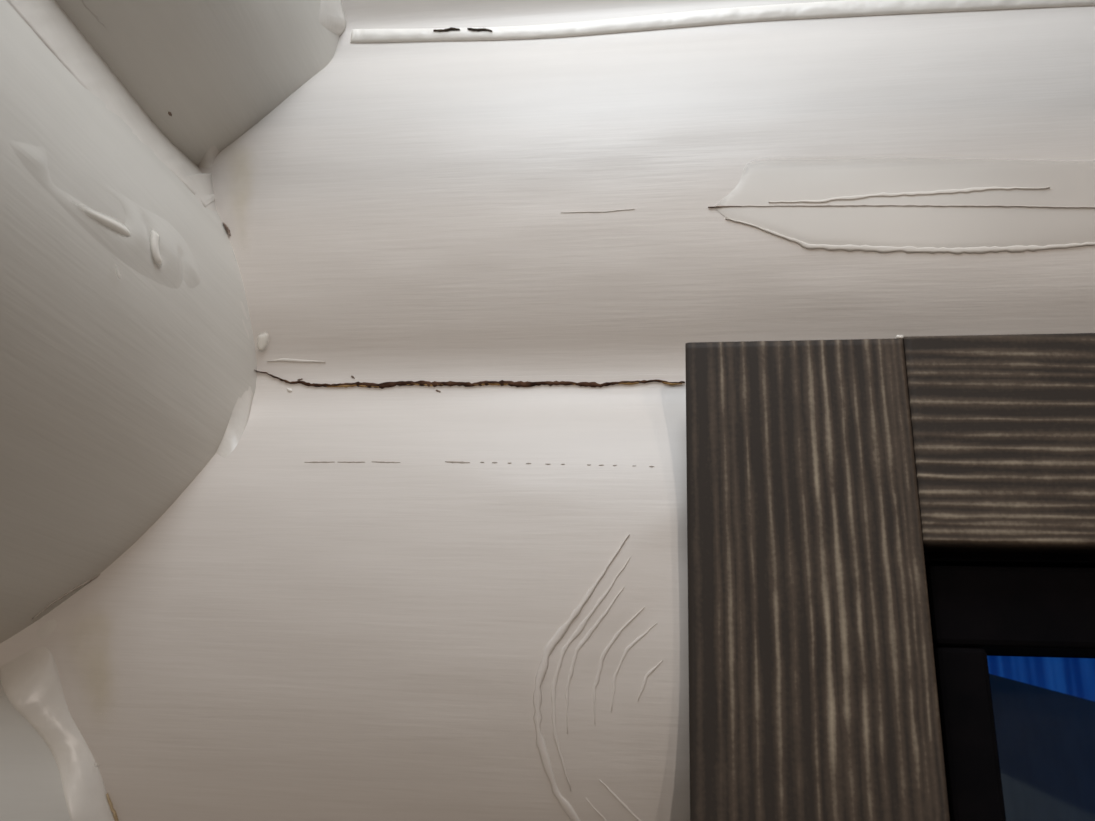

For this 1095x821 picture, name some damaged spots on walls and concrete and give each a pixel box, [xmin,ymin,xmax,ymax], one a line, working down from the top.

crack [433,25,493,33]
crack [255,358,685,392]